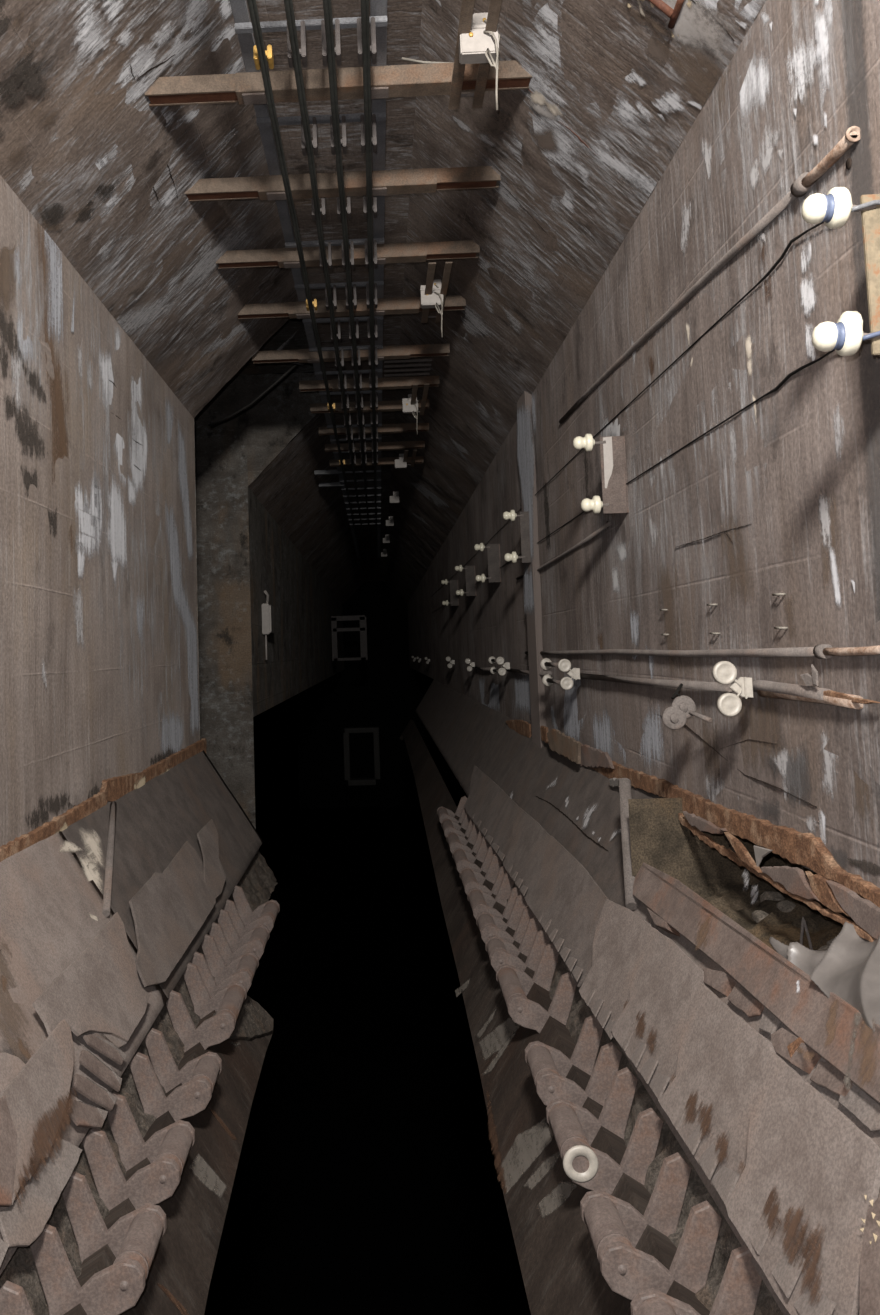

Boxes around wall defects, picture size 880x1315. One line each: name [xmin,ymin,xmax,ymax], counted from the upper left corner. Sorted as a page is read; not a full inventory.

damp [735,0,772,30]
damp [449,2,702,341]
damp [729,59,813,219]
damp [0,144,136,497]
damp [72,0,254,765]
rust [0,738,206,862]
rust [505,720,880,942]
crack [690,830,737,854]
spalling [628,798,854,951]
rust [15,1092,77,1204]
rust [685,1092,746,1172]
rust [763,1189,822,1302]